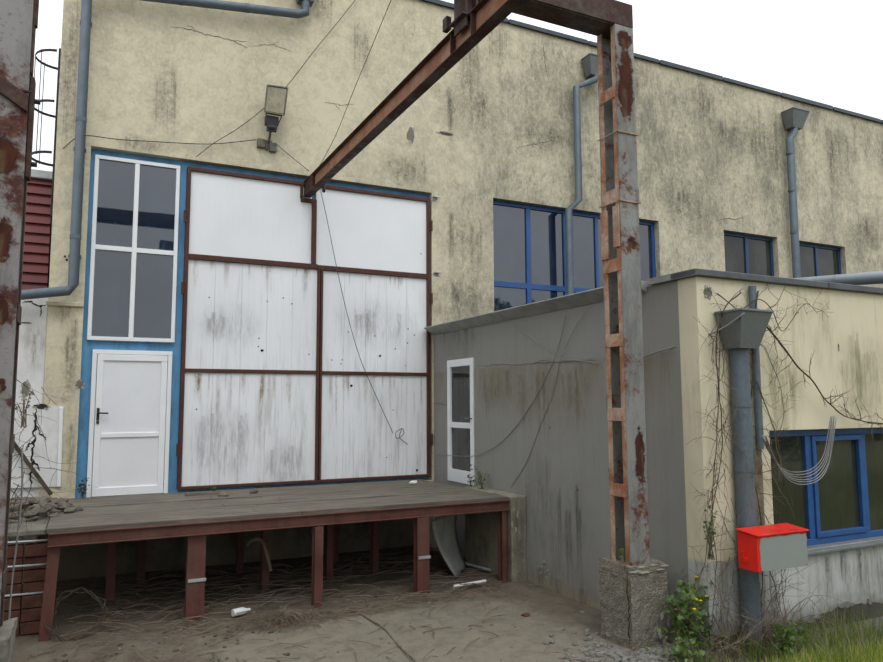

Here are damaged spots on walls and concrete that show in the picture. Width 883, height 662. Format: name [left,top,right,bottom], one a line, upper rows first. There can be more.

crack [175,26,289,51]
rust [617,30,635,120]
rust [0,133,19,175]
rust [0,217,13,262]
rust [0,295,9,324]
crack [25,409,46,486]